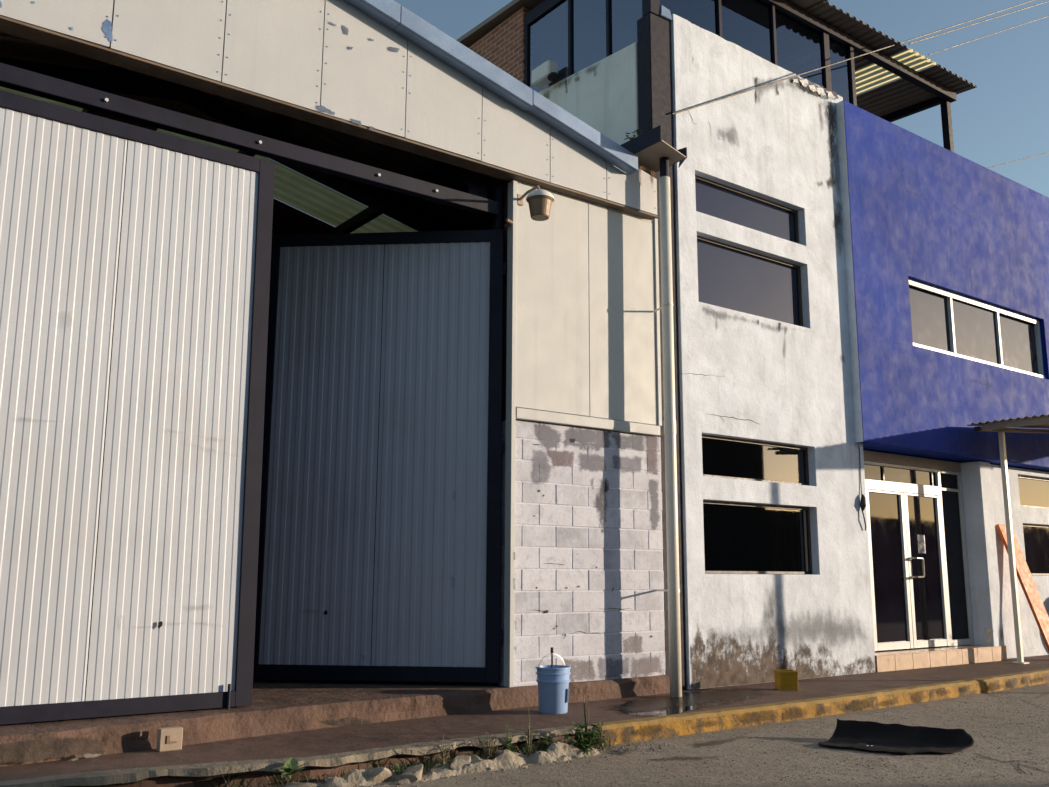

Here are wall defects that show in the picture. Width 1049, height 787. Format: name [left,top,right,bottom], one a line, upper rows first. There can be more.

peeling [102,19,113,42]
water stain [820,102,839,189]
water stain [592,479,609,531]
water stain [615,598,875,713]